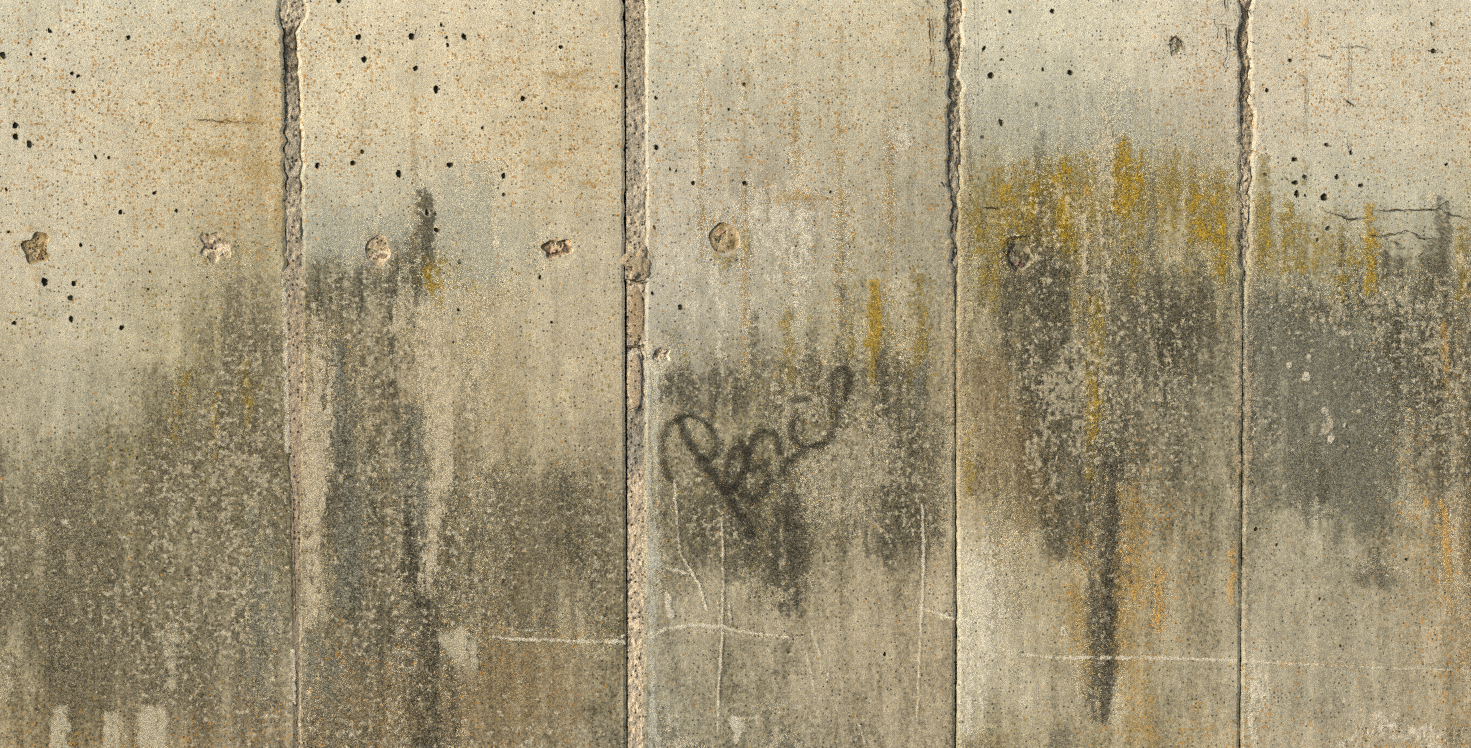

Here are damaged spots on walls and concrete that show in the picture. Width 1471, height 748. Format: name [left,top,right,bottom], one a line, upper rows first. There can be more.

spalling [20,232,49,265]
spalling [199,232,231,263]
spalling [365,234,391,268]
spalling [540,239,574,259]
spalling [708,220,750,275]
crack [1324,201,1470,254]
leakage [650,256,946,618]
leakage [979,105,1471,723]
leakage [0,188,619,748]